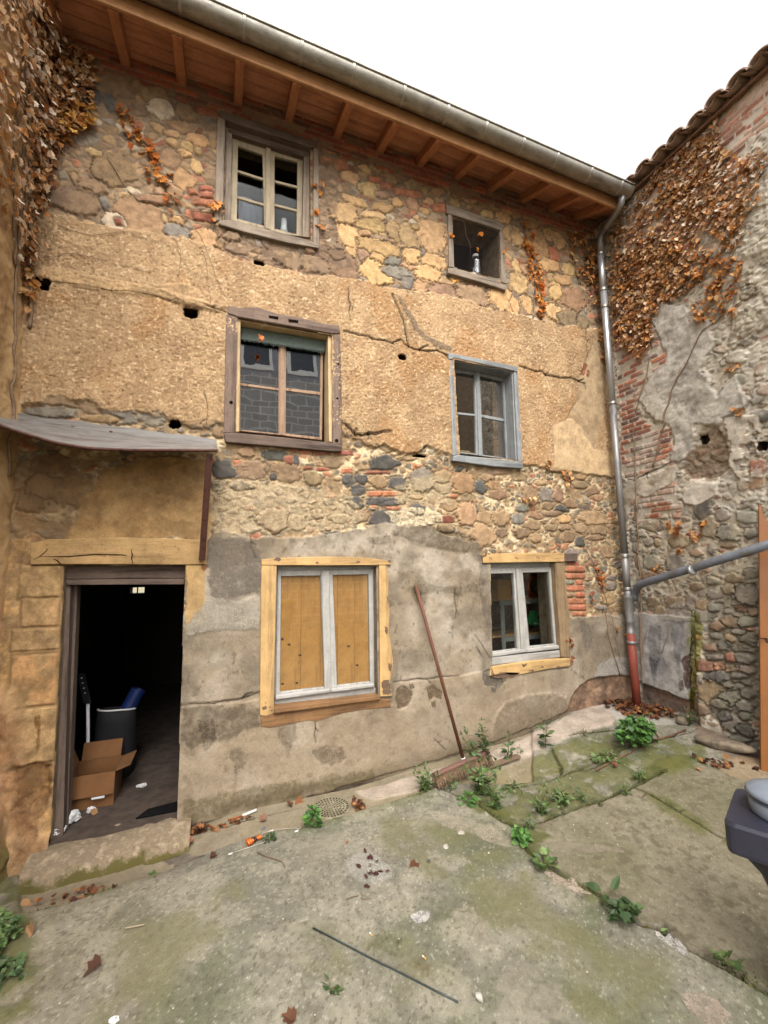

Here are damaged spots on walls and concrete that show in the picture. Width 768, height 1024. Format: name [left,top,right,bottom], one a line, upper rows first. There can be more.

crack [348,290,452,357]
spalling [682,428,729,481]